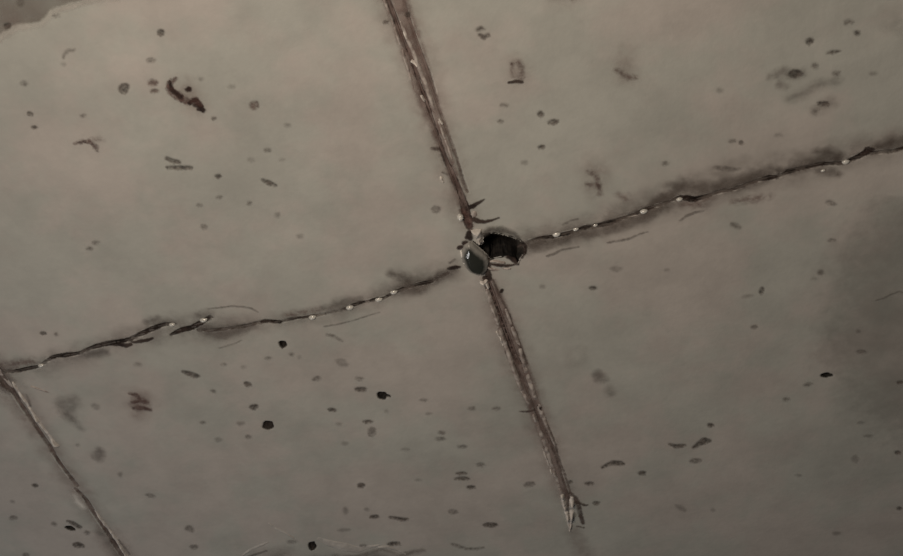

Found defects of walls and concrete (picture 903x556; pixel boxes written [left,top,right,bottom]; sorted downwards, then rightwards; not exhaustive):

crack [383,0,499,231]
hole [457,228,527,286]
crack [518,141,903,248]
crack [0,266,460,556]
crack [483,276,587,532]